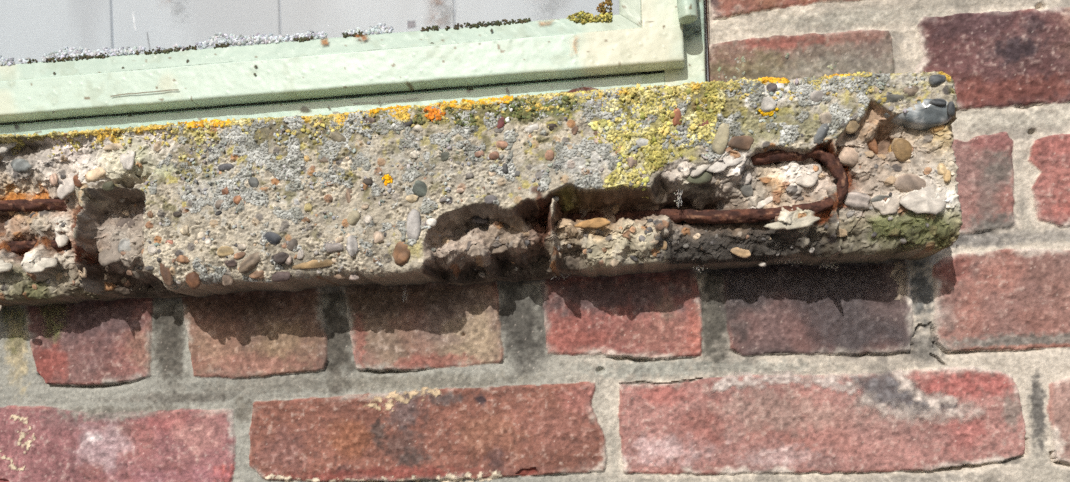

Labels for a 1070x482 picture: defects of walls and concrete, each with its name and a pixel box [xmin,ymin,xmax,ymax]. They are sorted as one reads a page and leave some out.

corrosion [0,191,50,200]
corrosion [0,237,51,254]
spalling [0,129,183,303]
spalling [420,100,963,300]
damp [665,225,904,353]
corrosion [815,143,853,224]